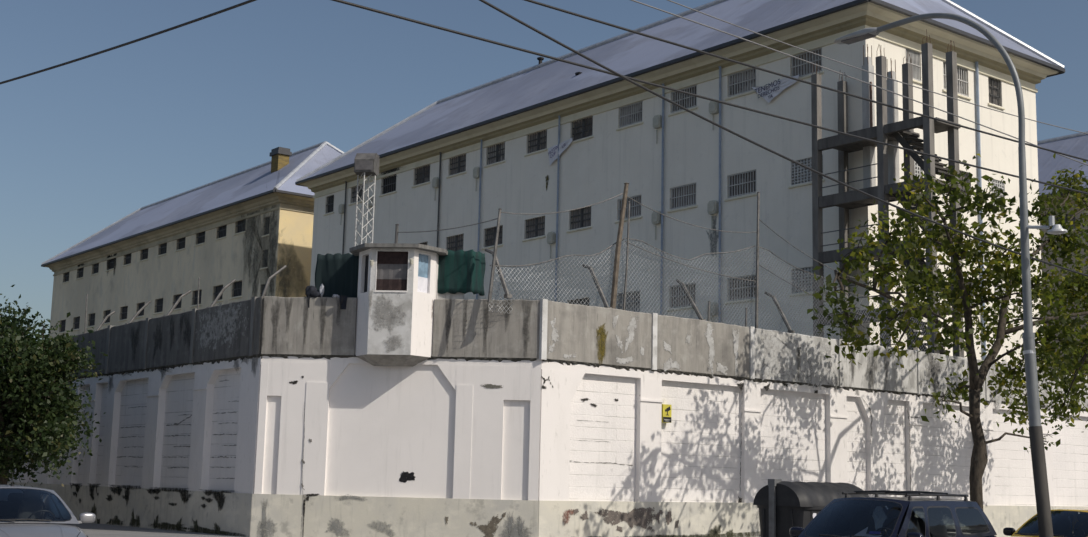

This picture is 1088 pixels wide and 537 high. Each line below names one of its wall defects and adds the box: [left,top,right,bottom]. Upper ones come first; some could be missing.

damp [243,215,305,340]
flaking render [470,513,506,537]
flaking render [569,507,679,533]